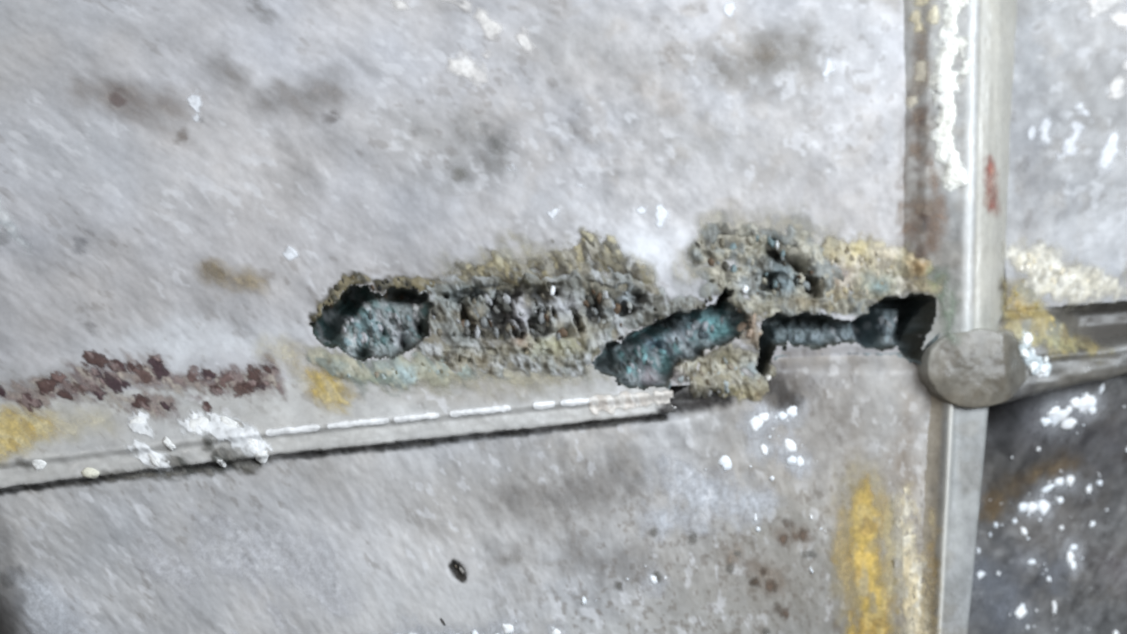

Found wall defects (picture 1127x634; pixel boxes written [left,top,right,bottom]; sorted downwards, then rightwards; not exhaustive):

rust [911,107,927,127]
peeling [318,275,420,349]
rust [307,182,945,404]
peeling [618,296,724,374]
peeling [786,315,897,345]
rust [1001,280,1112,356]
rust [0,349,293,454]
peeling [589,390,673,415]
rust [750,568,783,591]
rust [780,523,813,557]
rust [836,478,894,634]